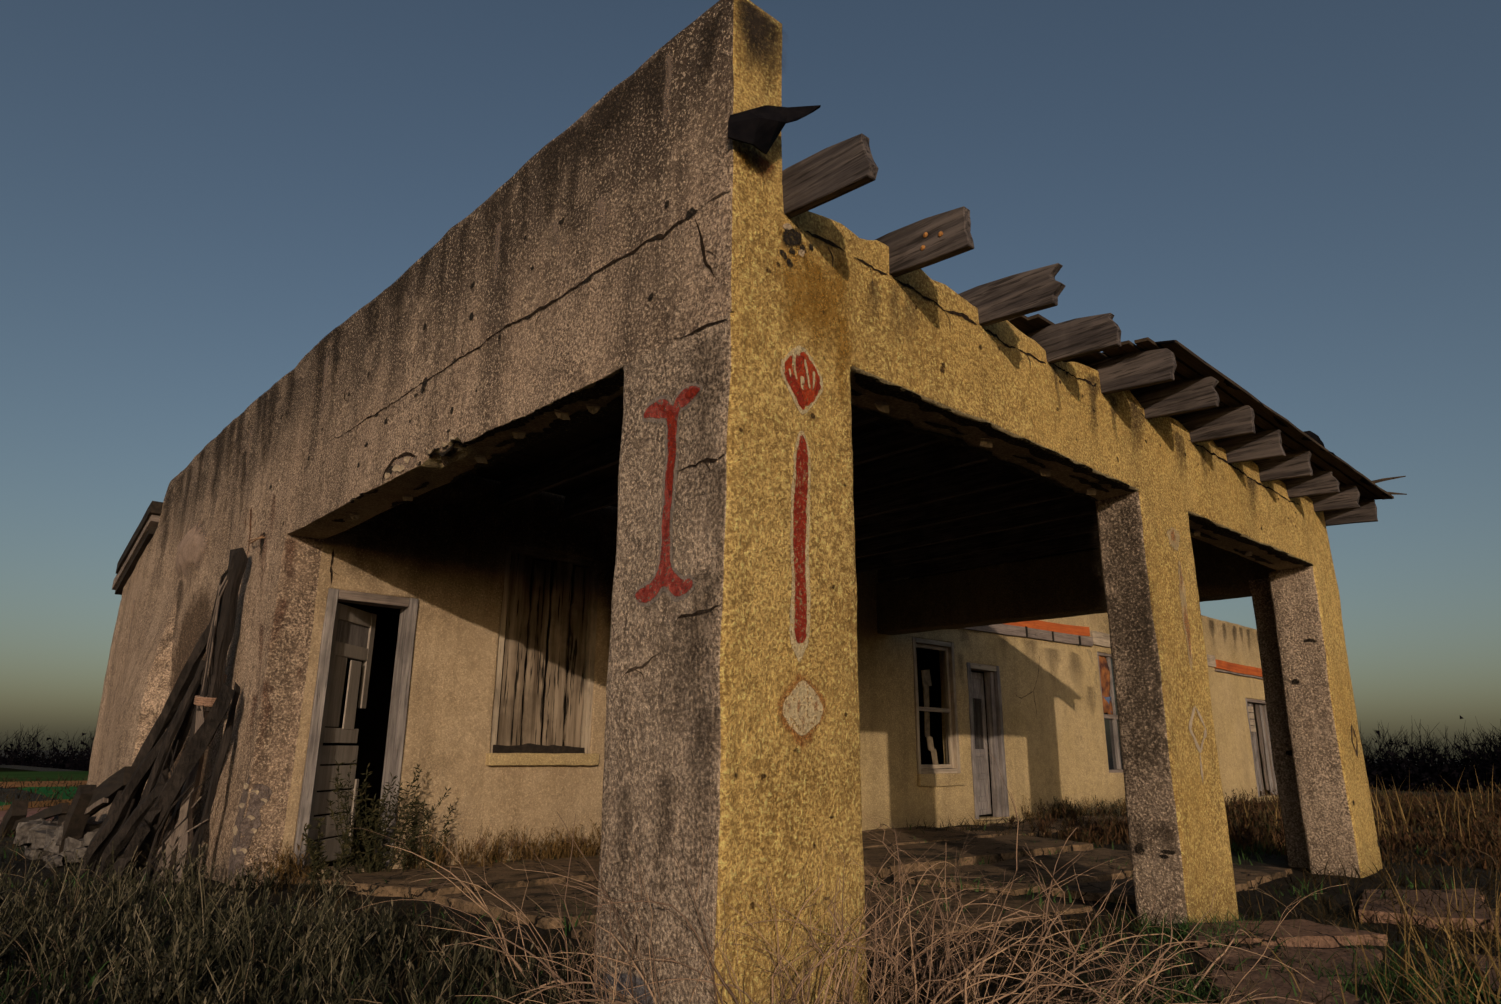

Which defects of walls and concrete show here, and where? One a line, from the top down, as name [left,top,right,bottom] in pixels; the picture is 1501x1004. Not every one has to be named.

leakage [317,326,343,397]
leakage [367,221,467,331]
crack [329,192,729,441]
crack [806,231,1097,385]
leakage [165,370,295,520]
crack [621,654,658,684]
crack [675,605,720,631]